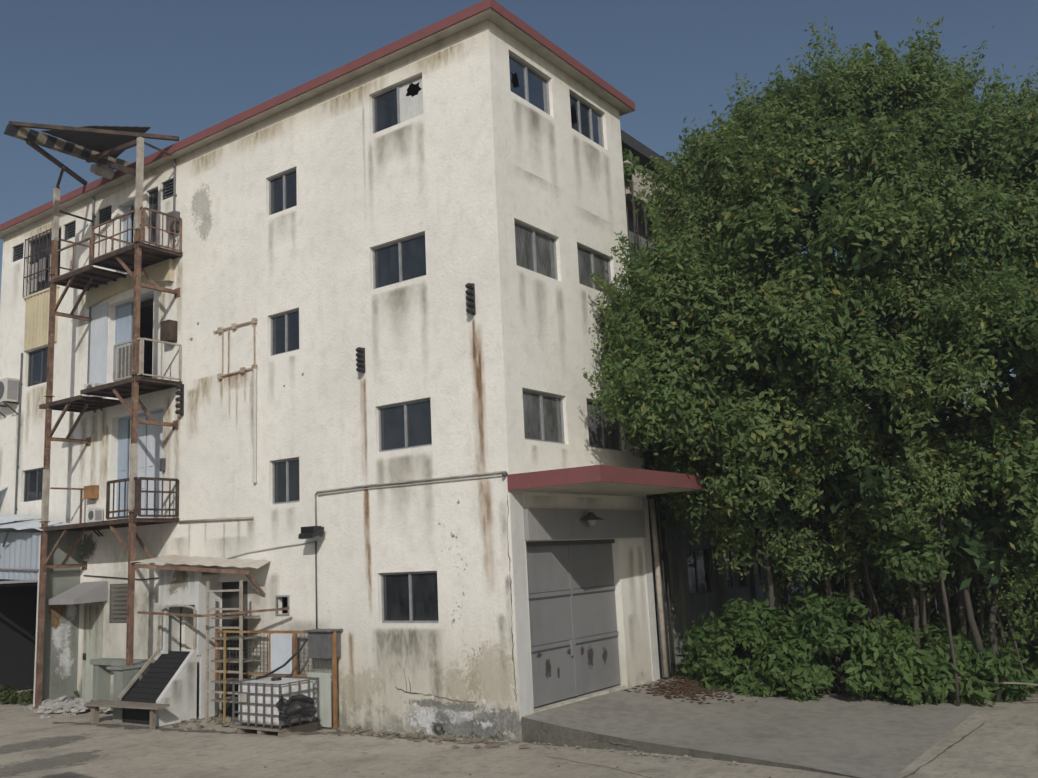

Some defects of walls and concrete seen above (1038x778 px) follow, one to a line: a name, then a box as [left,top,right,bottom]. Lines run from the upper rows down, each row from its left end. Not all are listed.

corrosion [473,322,482,398]
corrosion [537,652,560,678]
corrosion [567,646,607,669]